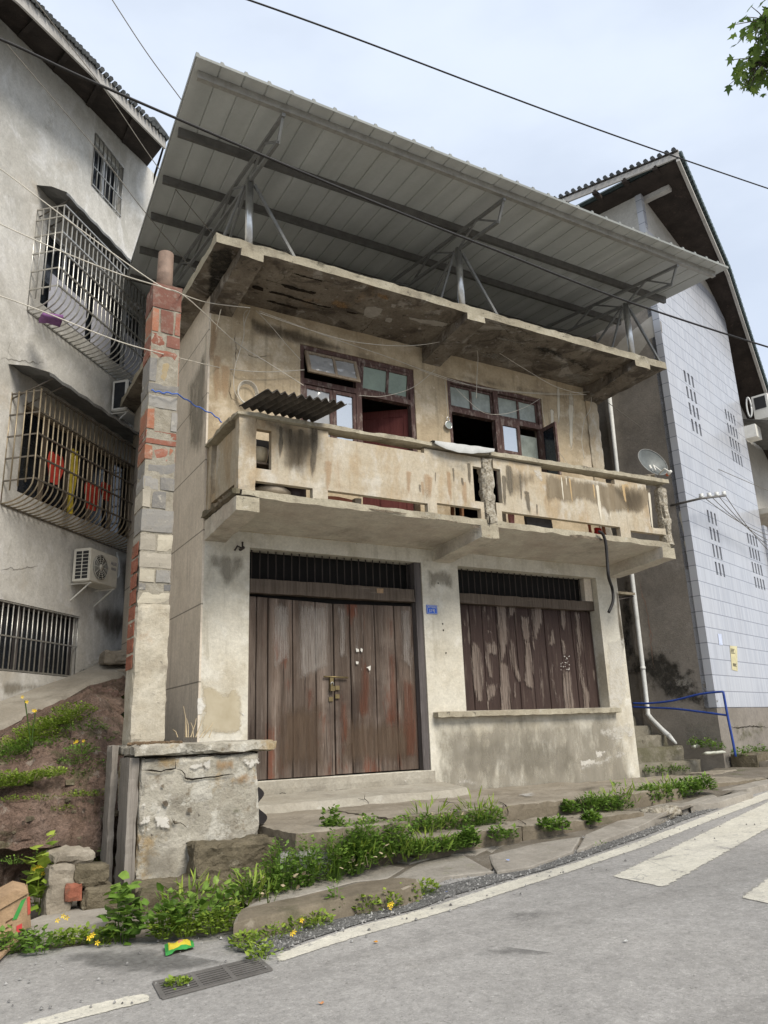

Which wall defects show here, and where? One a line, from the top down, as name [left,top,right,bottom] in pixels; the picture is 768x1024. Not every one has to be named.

water stain [190,310,221,444]
water stain [502,465,653,528]
peeling [464,606,590,710]
water stain [608,594,706,708]
peeling [141,784,179,831]
crack [143,750,265,781]